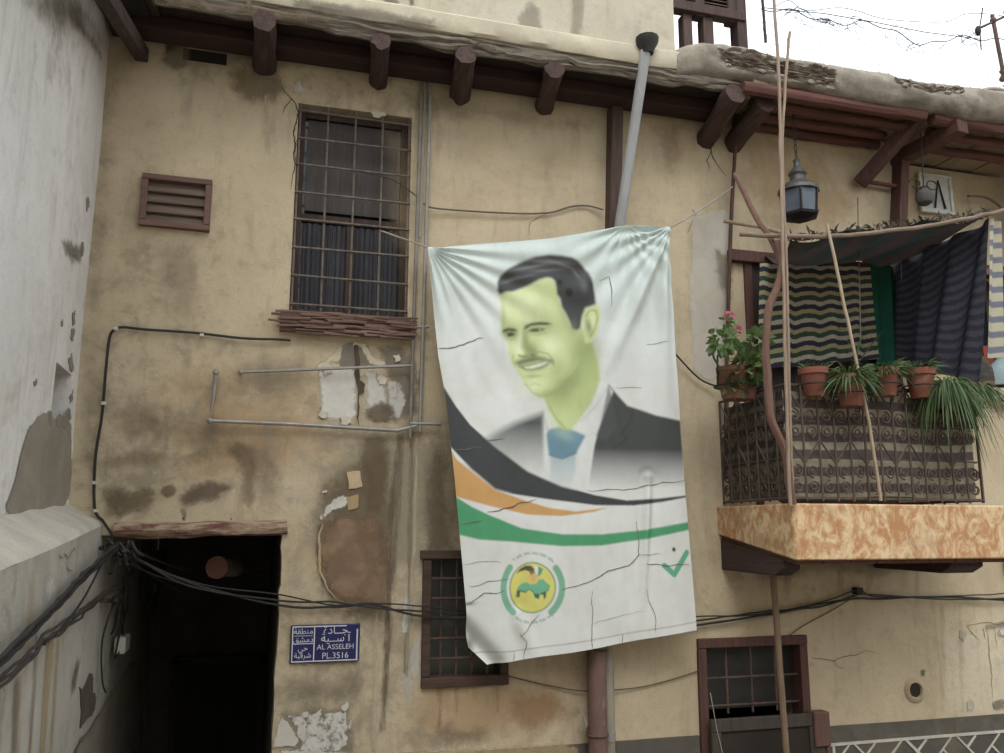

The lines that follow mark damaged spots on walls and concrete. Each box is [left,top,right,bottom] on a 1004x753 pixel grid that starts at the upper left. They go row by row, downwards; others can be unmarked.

spalling [717,47,836,85]
peeling [61,310,76,341]
flaking render [317,342,415,425]
flaking render [47,389,74,429]
damp [107,481,227,518]
crack [813,650,877,670]
flaking render [72,663,96,729]
peeling [273,702,352,753]
peeling [410,743,578,753]